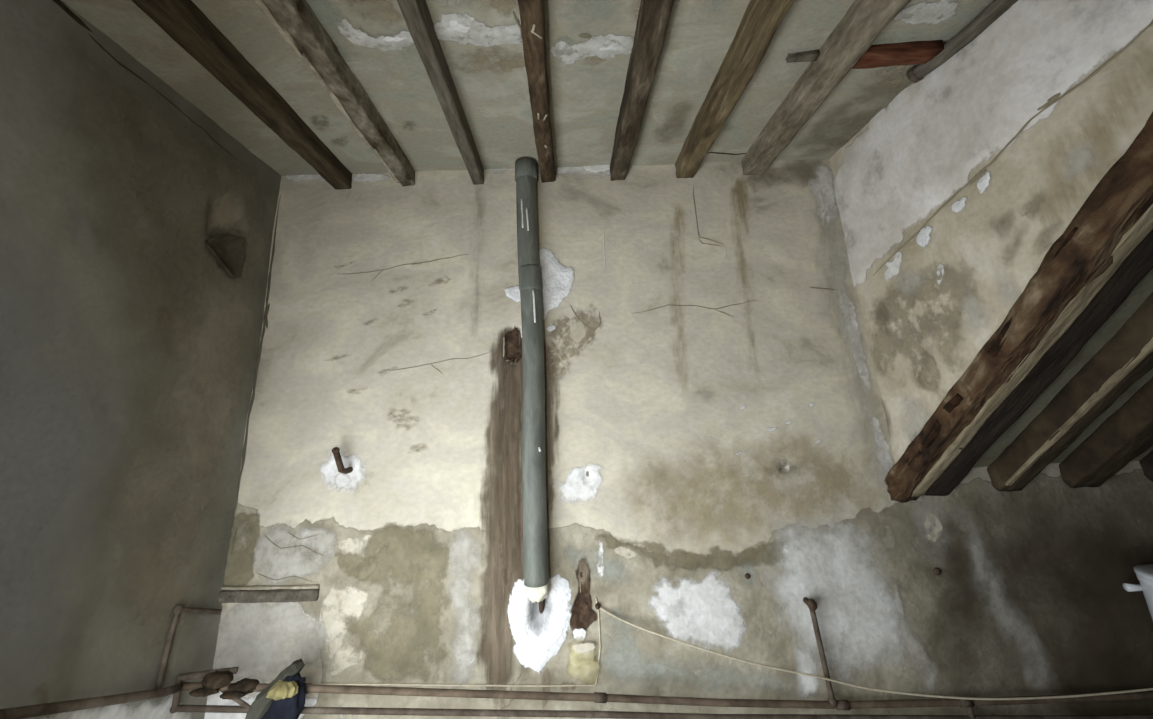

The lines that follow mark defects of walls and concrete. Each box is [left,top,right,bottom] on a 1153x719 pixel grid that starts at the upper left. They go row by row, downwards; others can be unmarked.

peeling [338,0,414,51]
peeling [434,0,525,74]
peeling [551,33,634,66]
peeling [951,197,967,213]
peeling [977,172,990,194]
peeling [916,226,932,247]
water stain [547,312,600,375]
rust [478,329,524,702]
water stain [599,535,789,570]
water stain [335,524,449,681]
water stain [941,513,1153,715]
water stain [796,649,818,696]